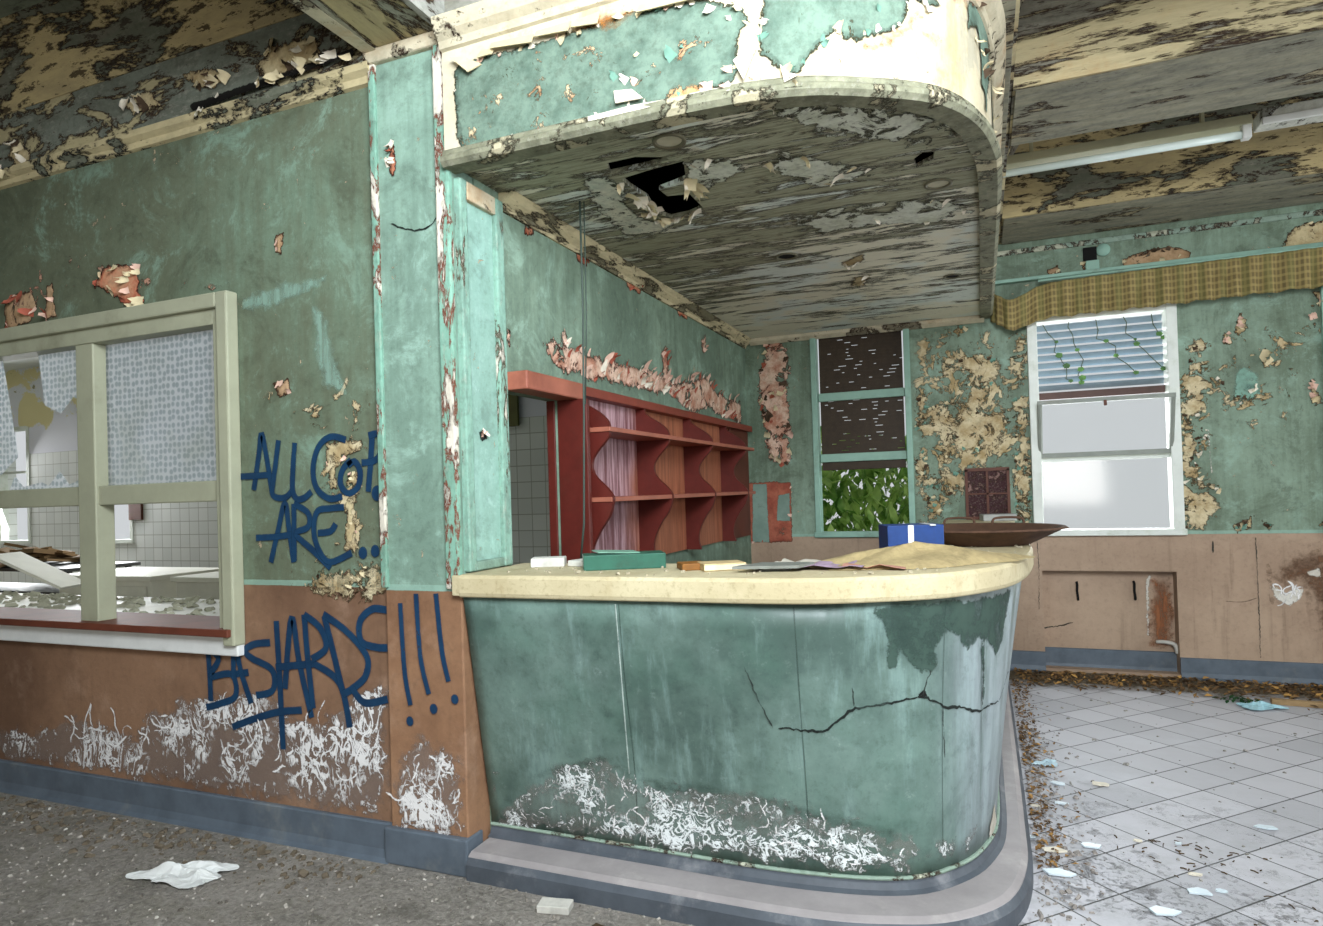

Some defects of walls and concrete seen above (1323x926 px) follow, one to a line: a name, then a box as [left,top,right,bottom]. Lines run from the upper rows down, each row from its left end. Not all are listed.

peeling [182,35,354,117]
peeling [450,0,960,149]
spalling [581,157,745,235]
peeling [92,254,151,307]
peeling [291,311,386,604]
peeling [543,329,742,424]
peeling [913,325,1033,523]
peeling [1179,291,1323,531]
water stain [1272,554,1323,606]
crack [745,649,1008,756]
water stain [3,686,464,835]
water stain [501,759,918,874]